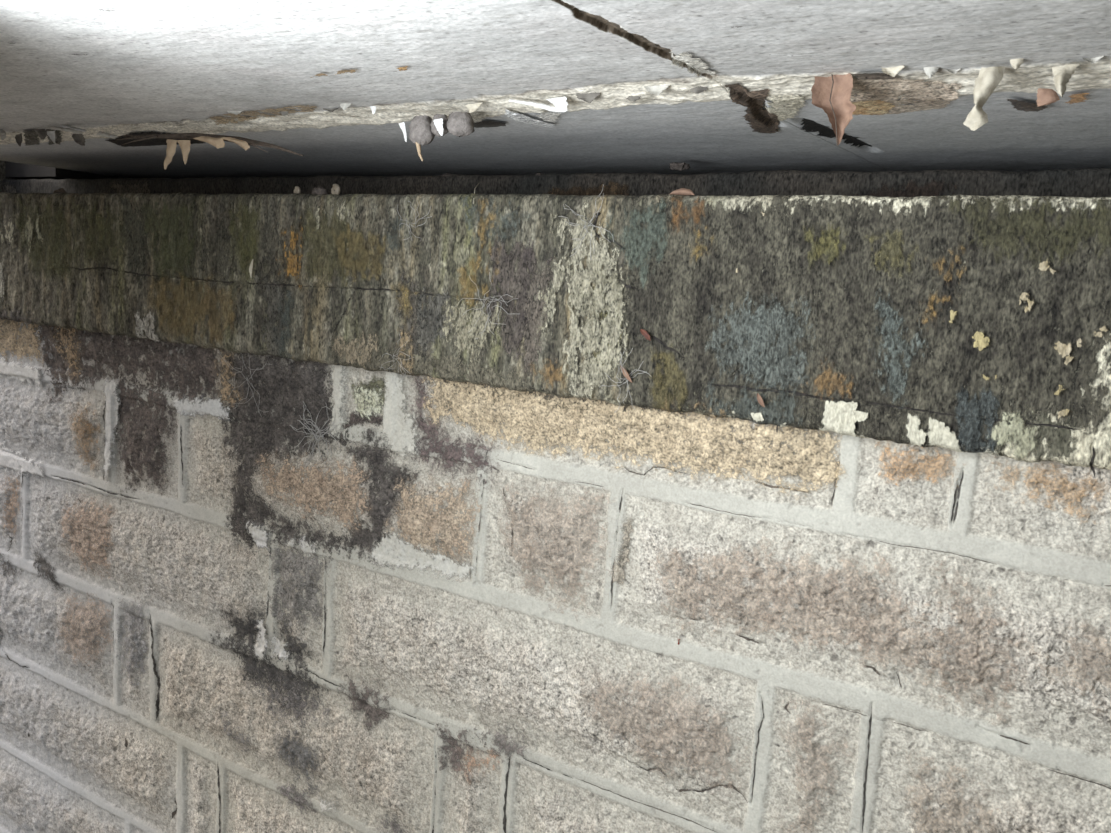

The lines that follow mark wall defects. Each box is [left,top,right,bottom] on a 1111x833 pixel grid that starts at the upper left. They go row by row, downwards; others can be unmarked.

crack [559,0,671,52]
peeling [465,102,486,122]
peeling [505,92,601,128]
peeling [626,84,670,102]
spalling [669,51,716,94]
spalling [725,84,808,134]
peeling [850,65,961,115]
water stain [442,300,501,361]
water stain [525,200,684,416]
water stain [34,311,511,567]
water stain [983,411,1038,461]
water stain [209,604,390,819]